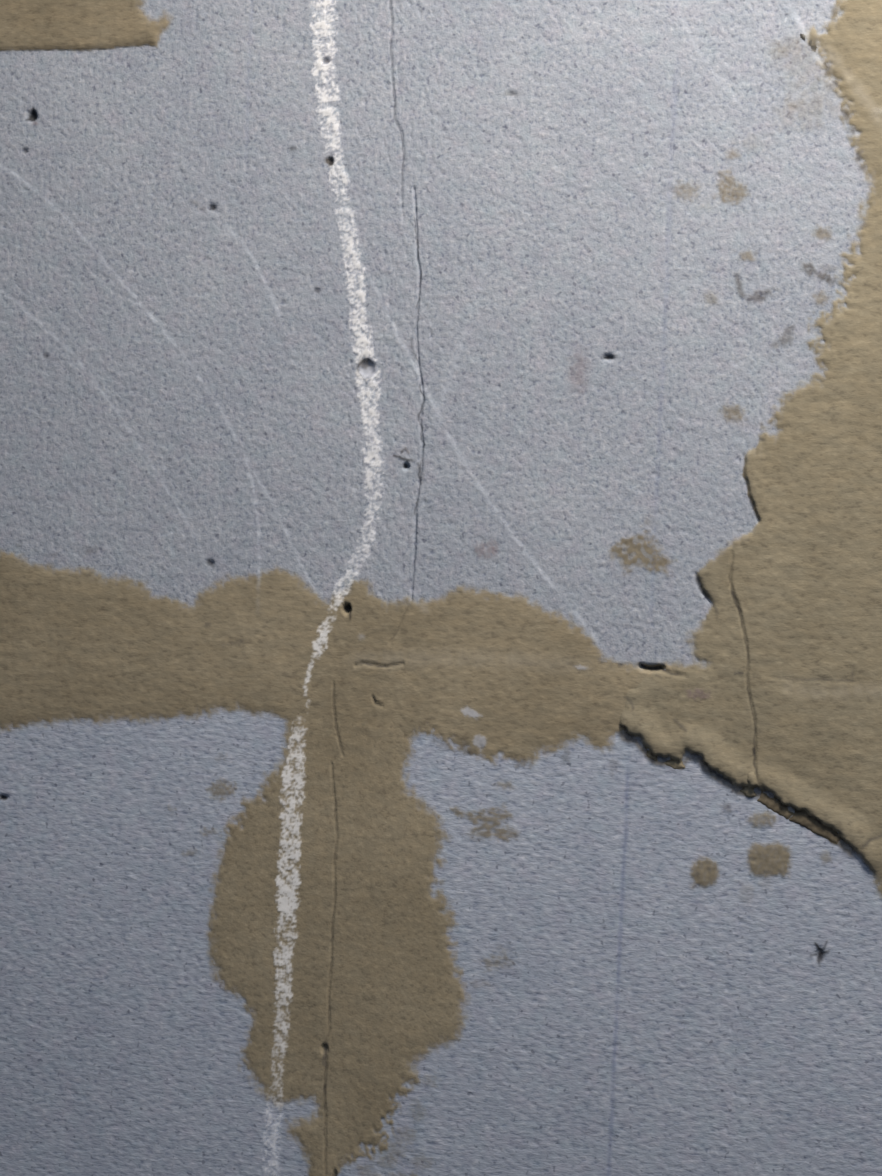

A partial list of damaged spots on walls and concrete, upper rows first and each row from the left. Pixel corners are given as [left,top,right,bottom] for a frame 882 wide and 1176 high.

flaking render [620,0,882,893]